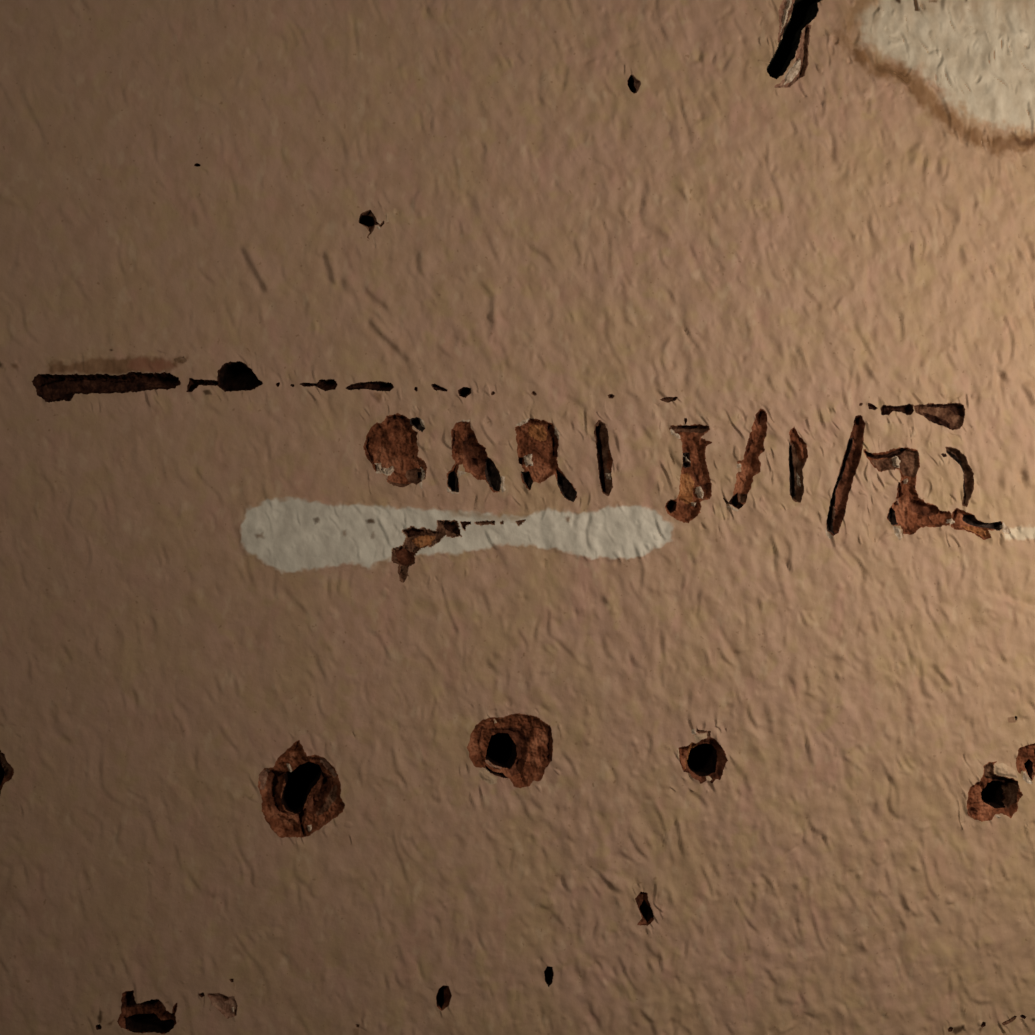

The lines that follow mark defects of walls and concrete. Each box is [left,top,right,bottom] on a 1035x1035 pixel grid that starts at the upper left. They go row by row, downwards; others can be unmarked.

spalling [767,0,821,88]
leakage [821,0,1035,164]
spalling [392,520,503,583]
spalling [946,518,1010,537]
spalling [257,740,345,838]
spalling [467,713,553,788]
spalling [676,729,728,784]
spalling [967,743,1035,822]
spalling [96,990,177,1034]